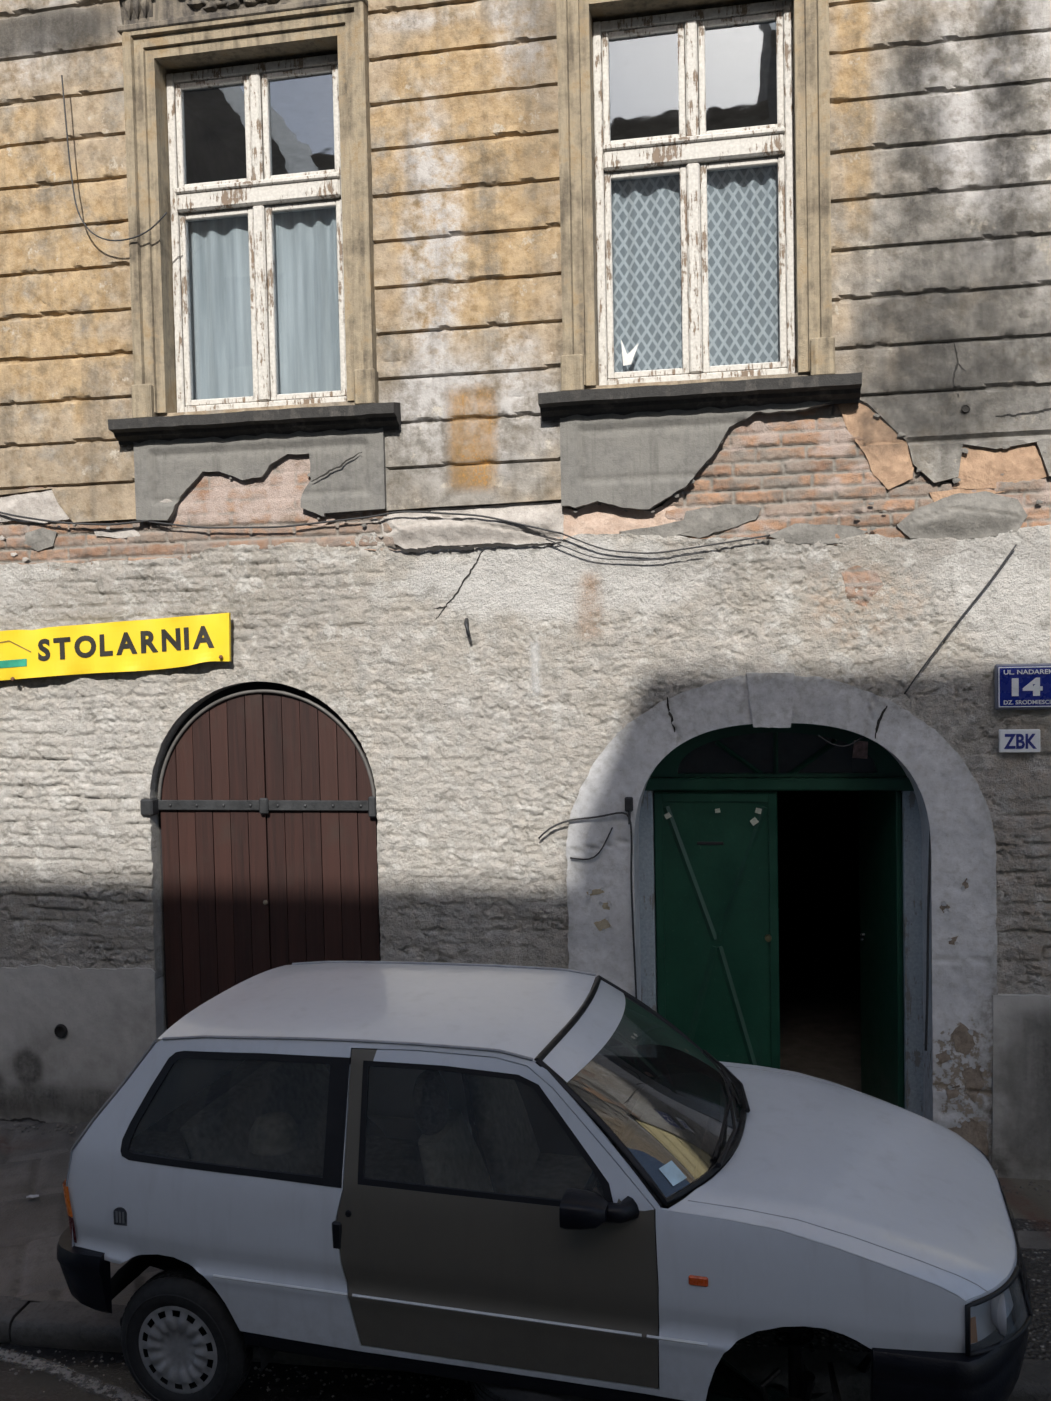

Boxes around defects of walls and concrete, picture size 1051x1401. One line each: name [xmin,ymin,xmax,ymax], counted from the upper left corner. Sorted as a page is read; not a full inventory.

spalling [0,454,396,570]
spalling [557,395,1051,545]
peeling [934,1022,989,1157]